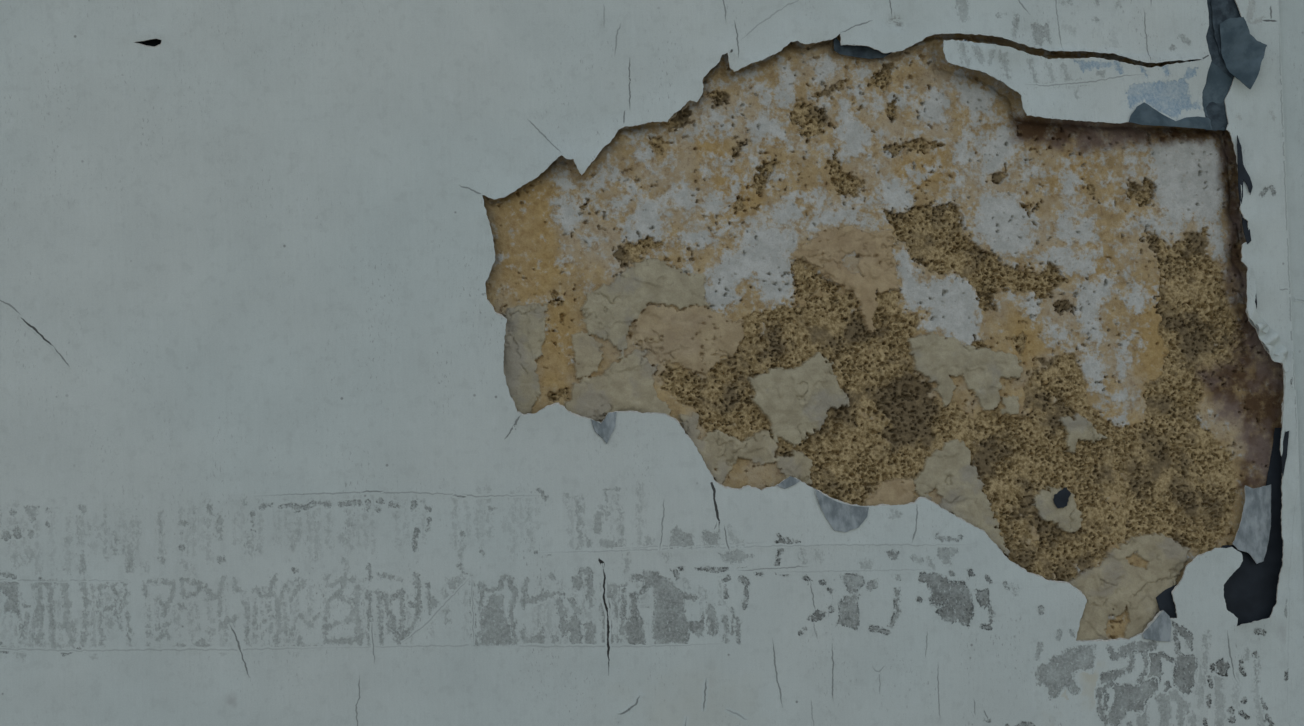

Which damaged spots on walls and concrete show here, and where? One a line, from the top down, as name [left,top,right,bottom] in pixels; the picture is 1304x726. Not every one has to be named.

crack [0,297,72,368]
spalling [482,0,1296,726]
crack [597,556,614,676]
crack [617,694,642,717]